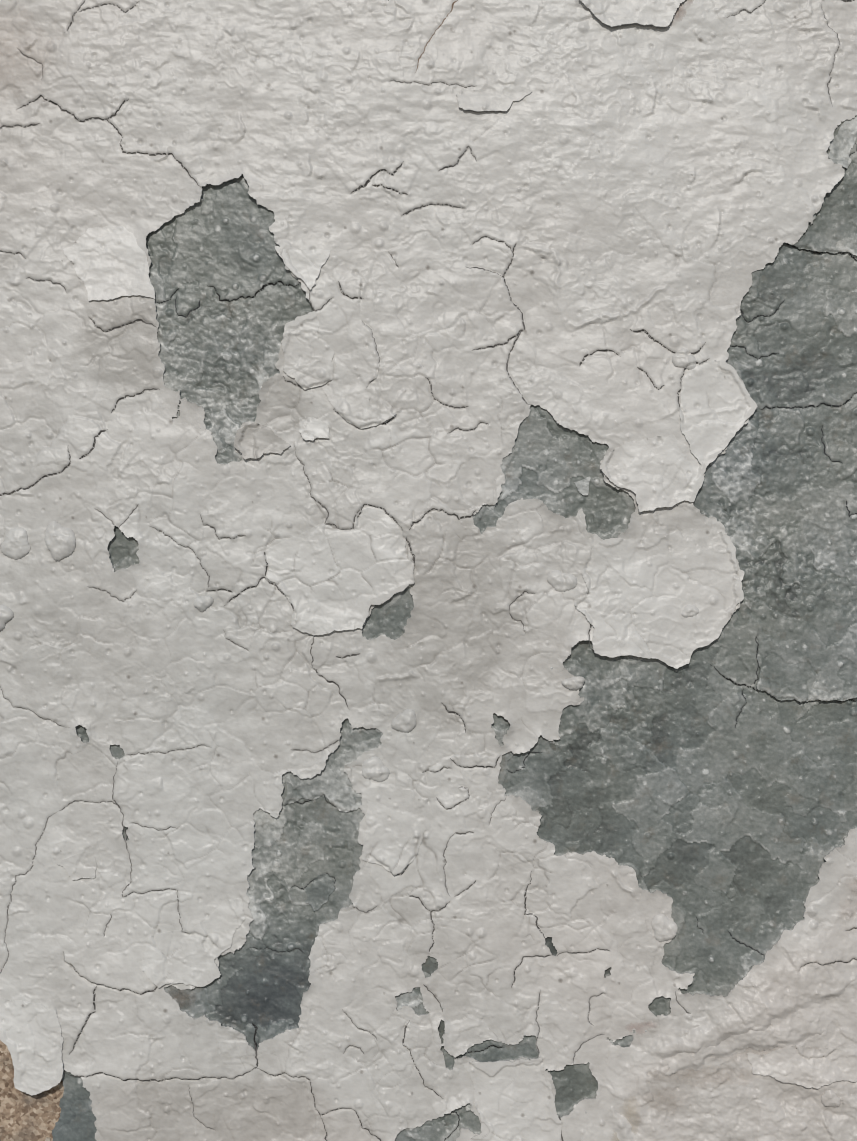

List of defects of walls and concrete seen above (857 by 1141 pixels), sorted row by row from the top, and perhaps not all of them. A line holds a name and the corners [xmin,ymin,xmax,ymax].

crack [0,48,203,189]
crack [352,161,461,215]
crack [0,388,157,496]
peeling [63,174,396,465]
crack [467,236,527,403]
crack [579,329,710,407]
peeling [265,506,415,640]
peeling [473,116,857,1016]
peeling [142,718,426,1064]
peeling [0,997,97,1141]
crack [63,952,381,1141]
peeling [395,956,598,1141]